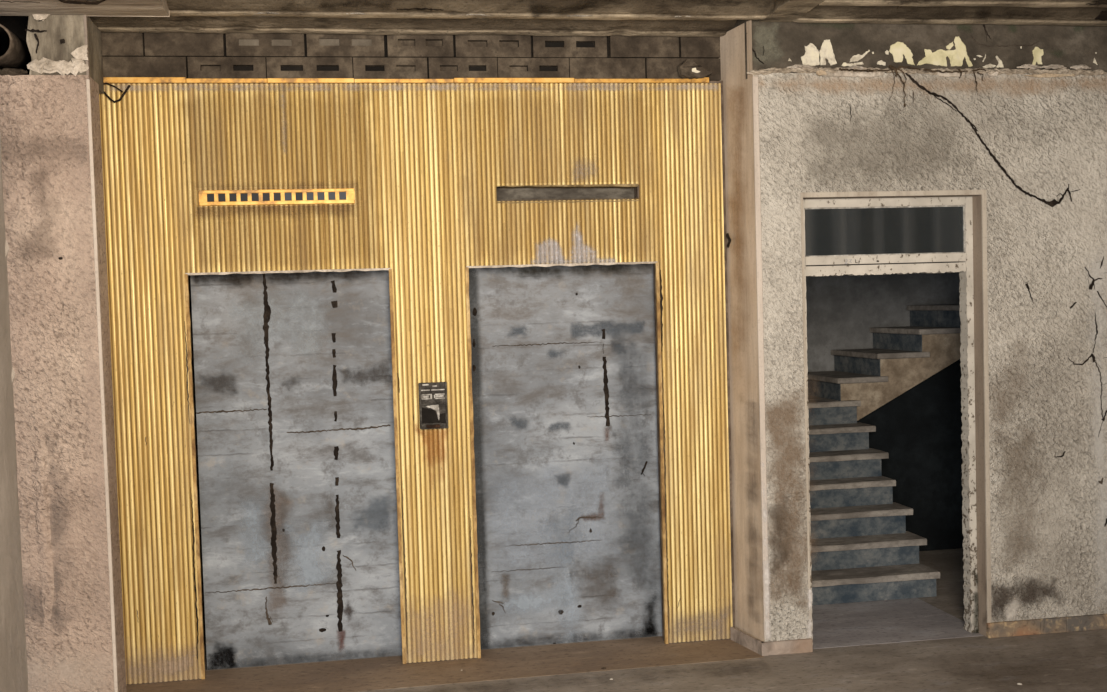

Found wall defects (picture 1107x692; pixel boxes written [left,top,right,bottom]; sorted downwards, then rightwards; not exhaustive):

spalling [0,45,89,76]
spalling [747,36,1107,78]
crack [905,73,1080,207]
crack [1068,256,1107,433]
crack [184,273,390,659]
water stain [992,580,1056,619]